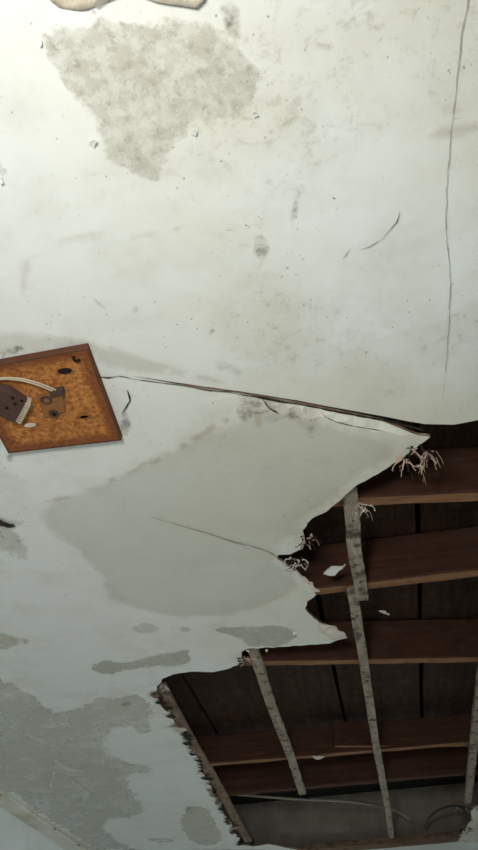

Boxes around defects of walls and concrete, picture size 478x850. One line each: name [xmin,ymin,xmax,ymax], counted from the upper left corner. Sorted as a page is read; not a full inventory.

crack [443,0,469,391]
crack [101,376,423,431]
peeling [324,564,346,576]
peeling [217,626,297,653]
peeling [319,623,346,640]
spalling [150,692,244,847]